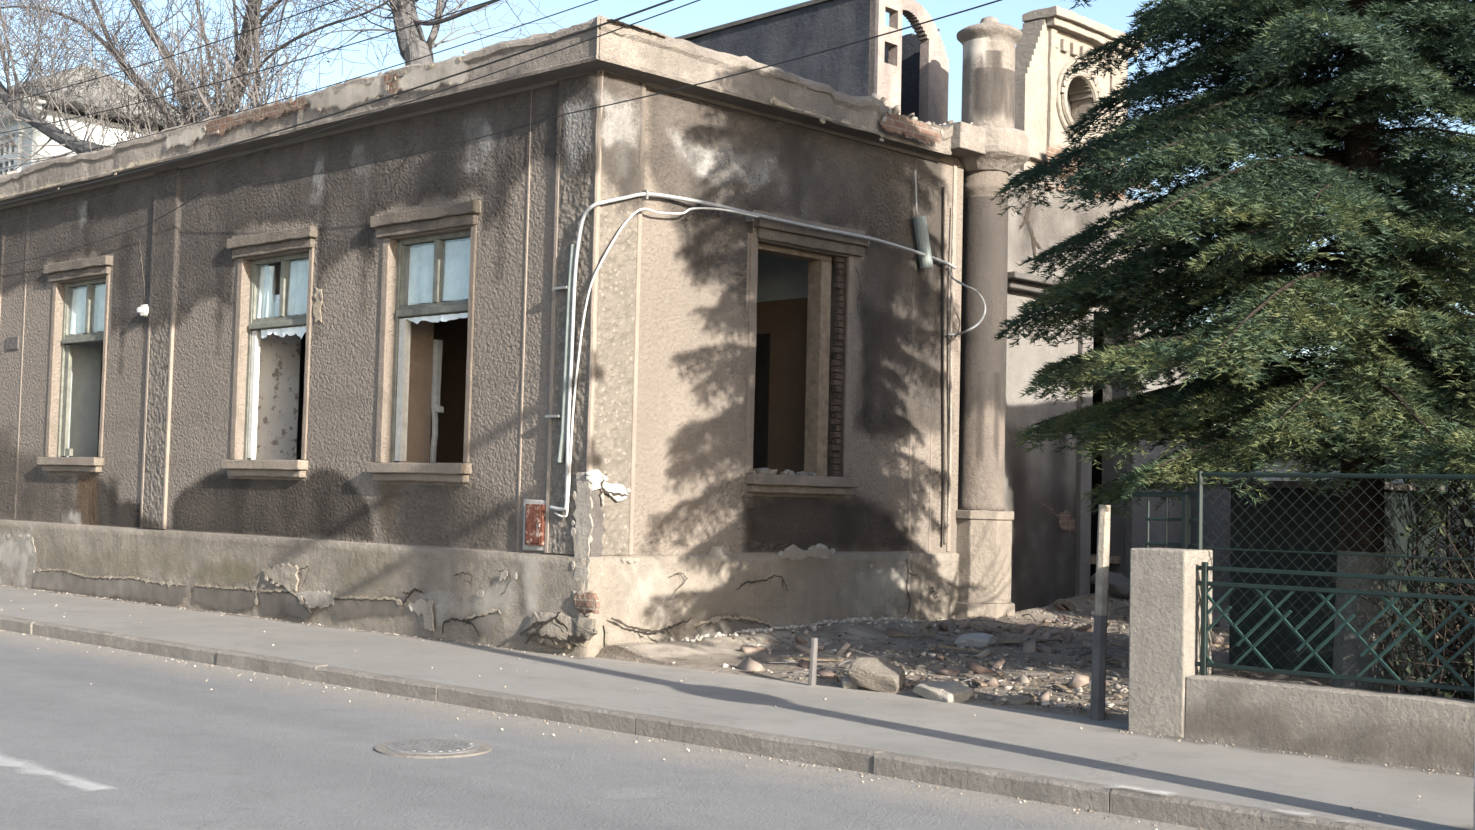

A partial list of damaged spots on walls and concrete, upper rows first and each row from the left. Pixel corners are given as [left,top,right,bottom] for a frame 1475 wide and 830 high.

flaking render [376,71,407,99]
flaking render [879,109,943,144]
damp [0,71,962,436]
damp [0,447,499,549]
flaking render [0,534,517,638]
flaking render [571,469,631,641]
crack [737,575,789,591]